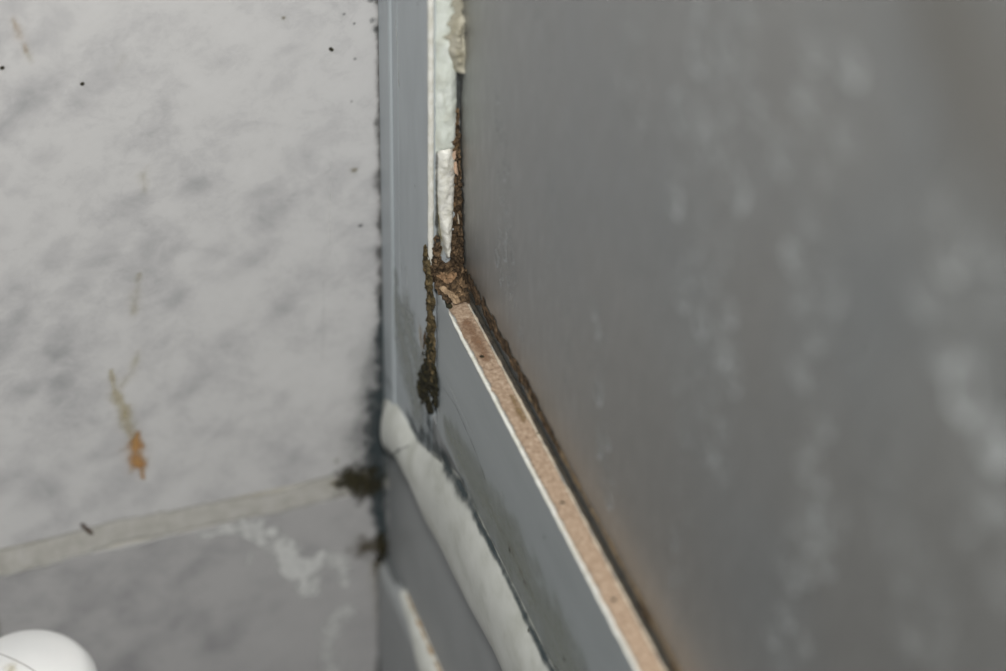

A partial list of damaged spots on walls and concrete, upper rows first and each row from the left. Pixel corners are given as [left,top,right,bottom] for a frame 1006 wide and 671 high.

rust [130,433,146,479]
water stain [199,517,351,597]
water stain [332,248,405,590]
water stain [407,73,681,671]